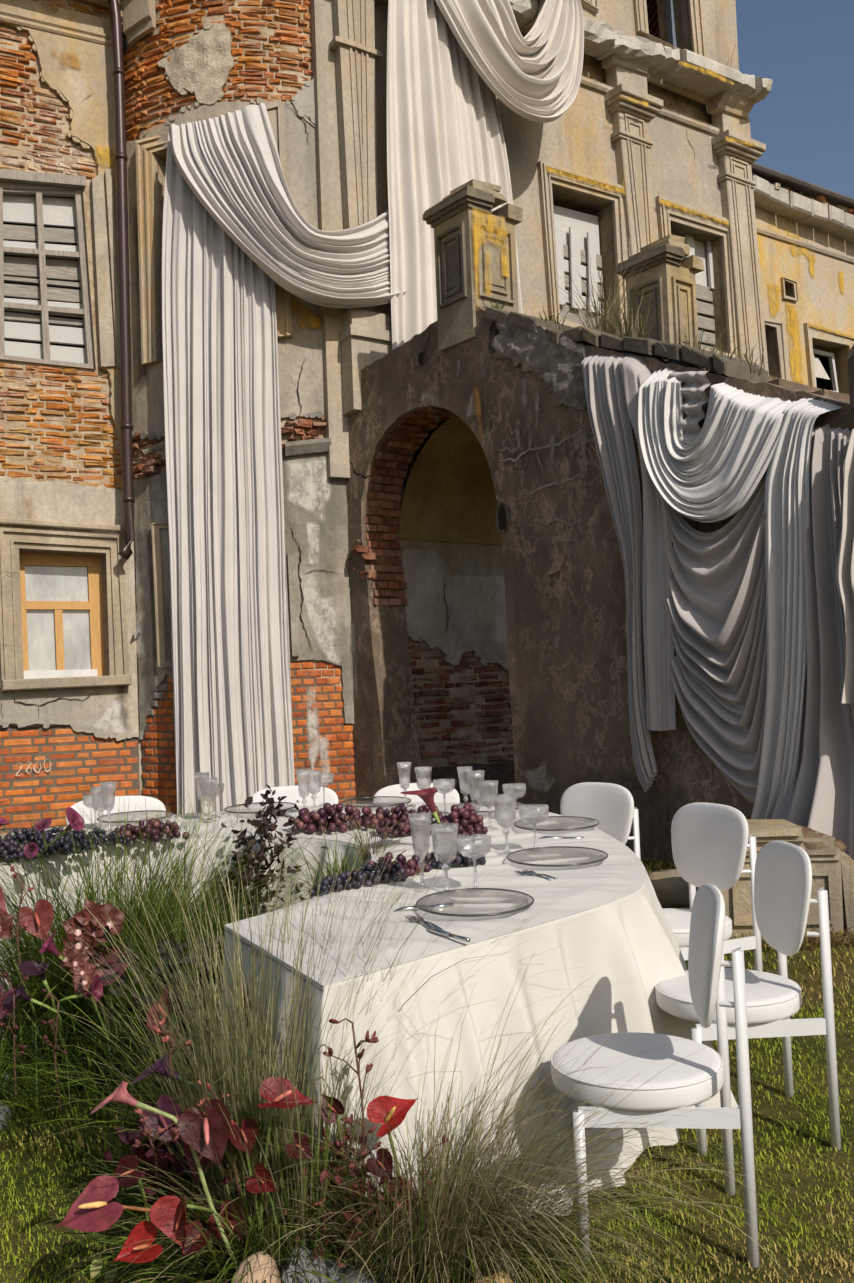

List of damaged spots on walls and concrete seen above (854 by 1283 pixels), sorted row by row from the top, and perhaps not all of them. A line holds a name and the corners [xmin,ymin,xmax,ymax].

spalling [0,21,98,179]
spalling [31,0,123,21]
spalling [123,0,316,142]
spalling [0,363,136,490]
peeling [346,392,514,768]
peeling [0,721,68,729]
crack [0,692,99,719]
peeling [91,699,126,741]